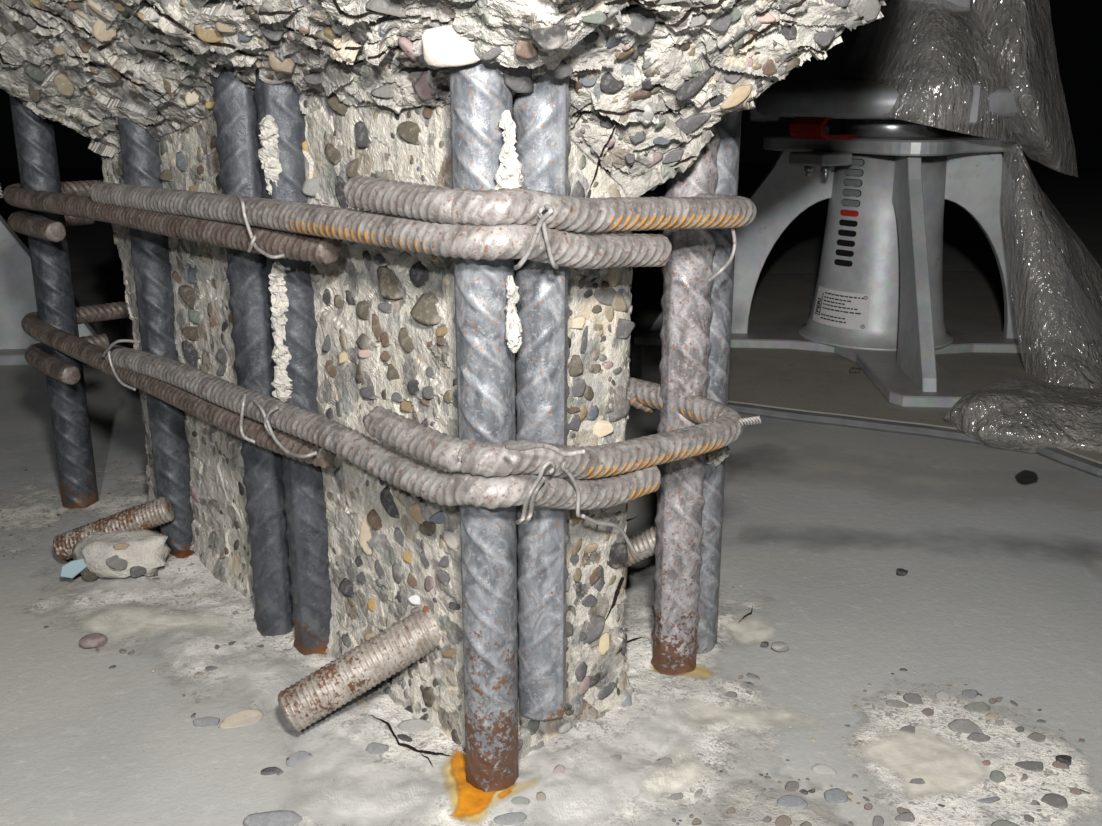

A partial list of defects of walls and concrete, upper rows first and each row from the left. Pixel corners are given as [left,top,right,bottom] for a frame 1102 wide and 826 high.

crack [1,0,268,101]
crack [235,0,401,64]
spalling [0,0,886,212]
crack [573,106,691,192]
crack [737,0,825,66]
spalling [310,239,458,473]
spalling [567,267,635,447]
spalling [184,411,255,600]
spalling [321,455,466,753]
spalling [517,502,635,760]
crack [368,714,454,767]
rust [444,751,522,821]